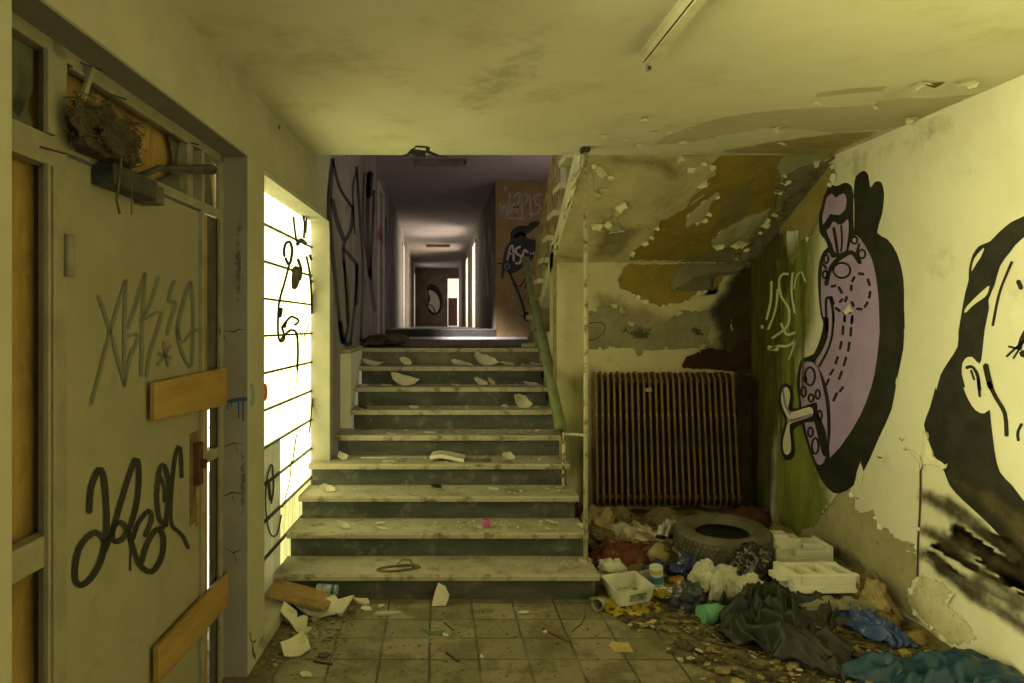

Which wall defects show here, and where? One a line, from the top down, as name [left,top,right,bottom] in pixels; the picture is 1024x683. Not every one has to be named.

peeling [912,78,981,91]
peeling [588,117,836,375]
peeling [905,431,948,470]
flaking render [798,463,976,645]